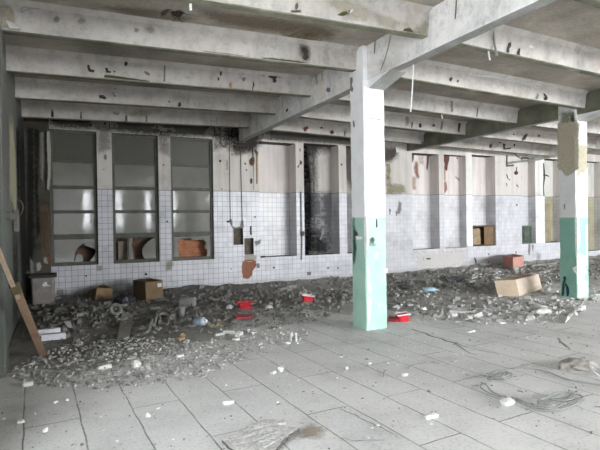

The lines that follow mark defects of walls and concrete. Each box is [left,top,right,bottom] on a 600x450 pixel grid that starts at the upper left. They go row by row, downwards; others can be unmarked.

peeling [557,120,587,177]
rust [412,155,429,189]
spalling [242,254,265,279]